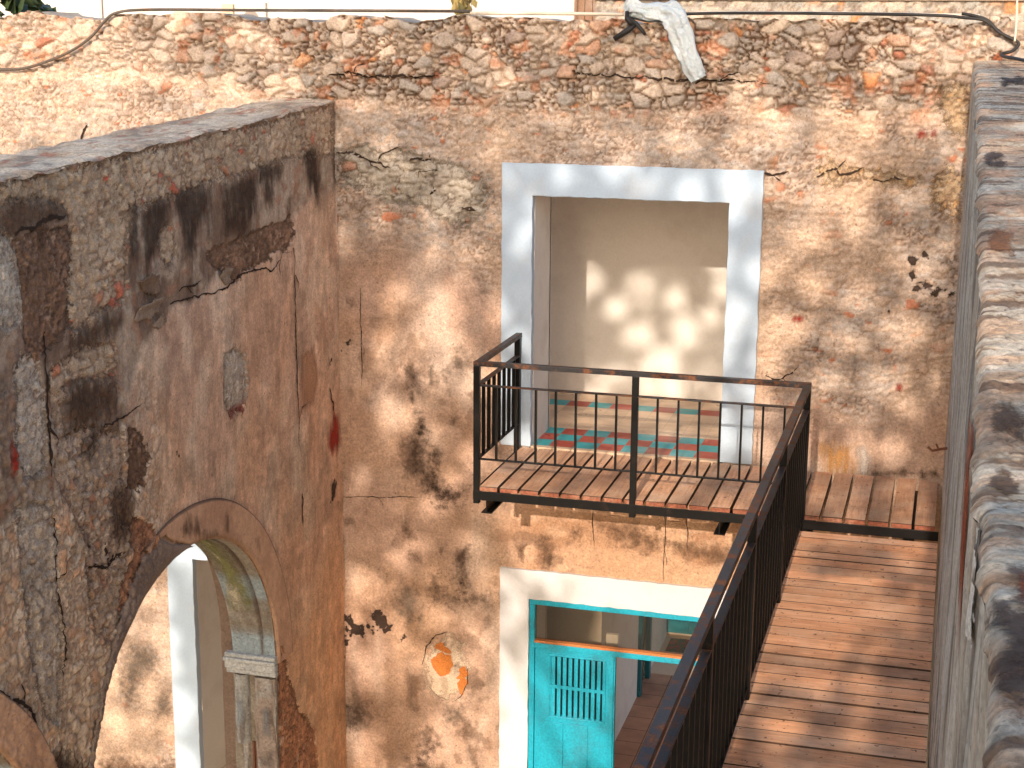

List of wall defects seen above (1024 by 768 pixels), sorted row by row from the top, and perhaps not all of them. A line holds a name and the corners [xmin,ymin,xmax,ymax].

crack [328,63,444,79]
crack [572,70,776,85]
leakage [305,149,319,203]
crack [336,147,438,195]
crack [817,160,902,182]
leakage [131,166,281,276]
spalling [907,251,955,298]
crack [170,248,335,452]
leakage [71,384,114,456]
spalling [0,103,495,768]
leakage [406,424,460,499]
leakage [985,565,1024,701]